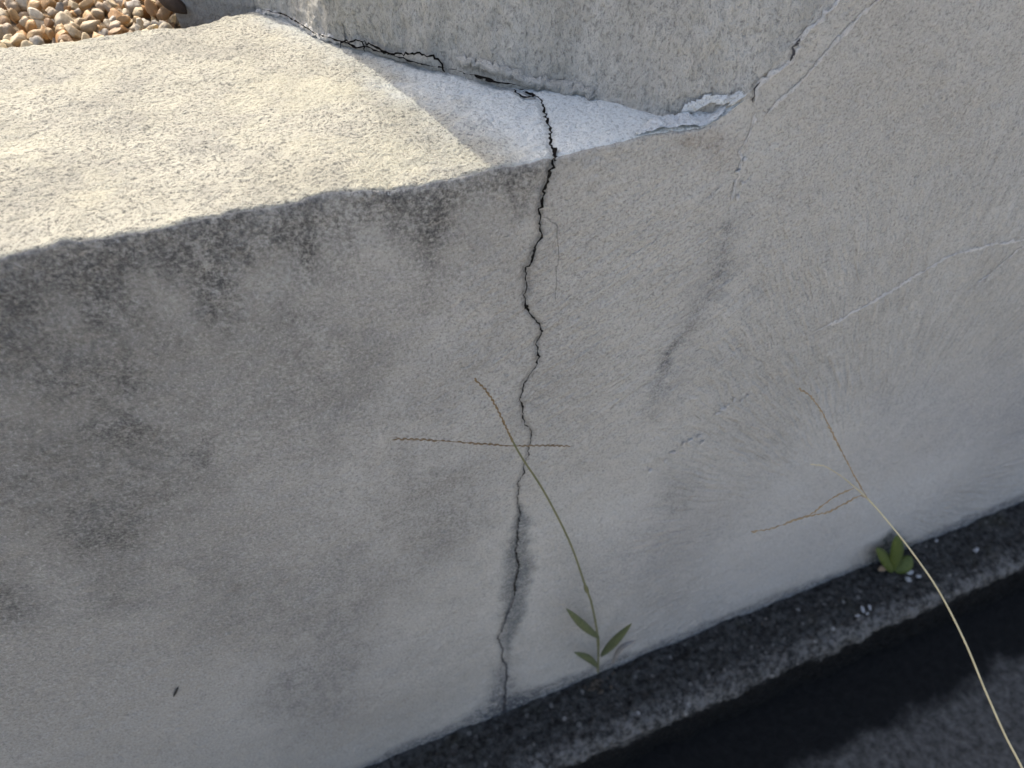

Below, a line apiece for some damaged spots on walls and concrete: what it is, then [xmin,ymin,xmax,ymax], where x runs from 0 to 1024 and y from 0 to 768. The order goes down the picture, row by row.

crack [262,9,557,714]
crack [752,0,840,103]